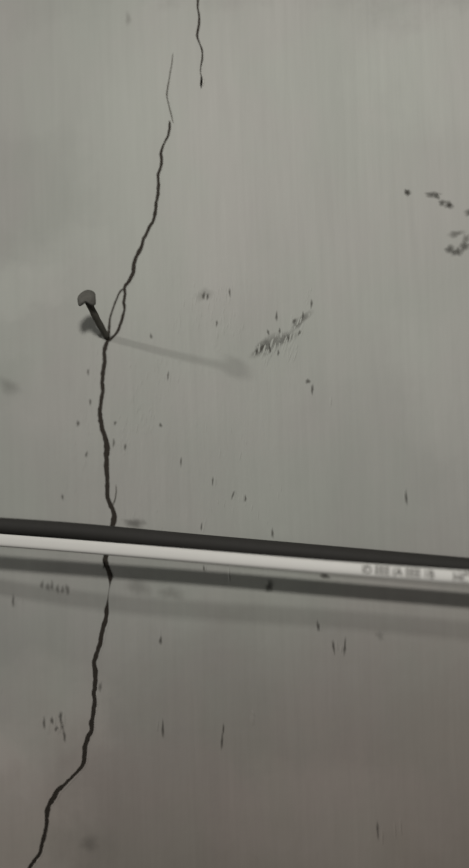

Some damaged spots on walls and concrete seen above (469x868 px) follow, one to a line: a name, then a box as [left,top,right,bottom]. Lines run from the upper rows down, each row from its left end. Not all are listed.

crack [196,0,205,87]
crack [98,54,173,526]
crack [28,555,113,868]